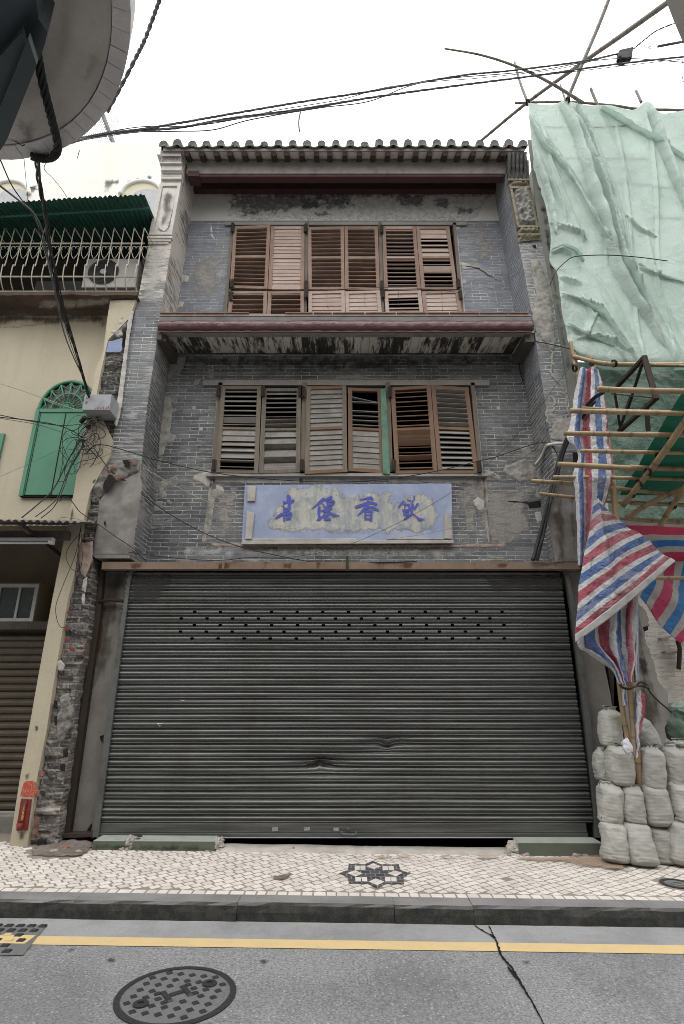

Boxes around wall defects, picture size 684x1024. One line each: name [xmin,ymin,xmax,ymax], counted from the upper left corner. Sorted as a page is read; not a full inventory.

crack [466,265,505,305]
flaking render [92,458,140,497]
peeling [193,469,224,536]
flaking render [484,446,542,523]